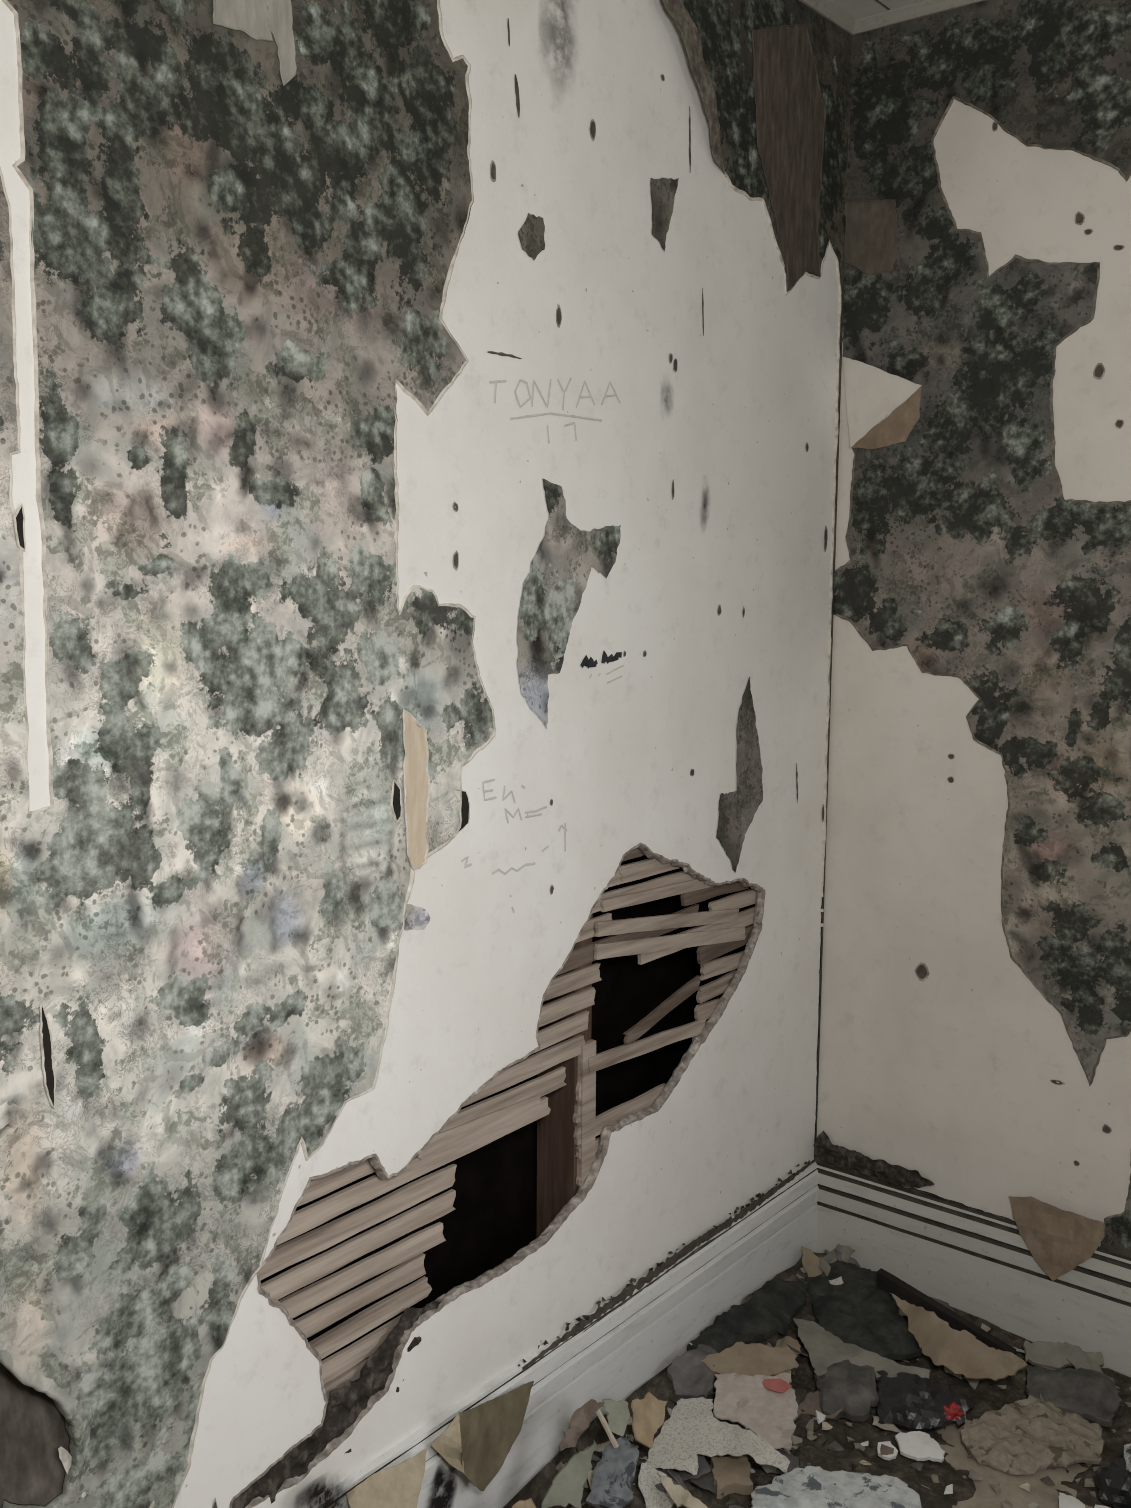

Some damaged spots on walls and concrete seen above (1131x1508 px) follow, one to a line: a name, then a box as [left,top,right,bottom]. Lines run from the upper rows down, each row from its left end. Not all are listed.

peeling [0,0,54,814]
peeling [931,96,1131,504]
peeling [172,0,856,1508]
peeling [817,614,1131,1233]
damp [297,1478,346,1508]
damp [429,1468,456,1508]